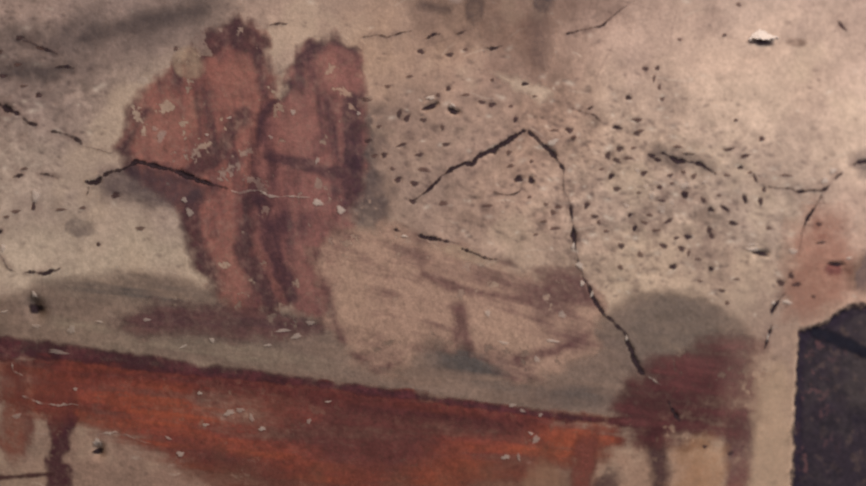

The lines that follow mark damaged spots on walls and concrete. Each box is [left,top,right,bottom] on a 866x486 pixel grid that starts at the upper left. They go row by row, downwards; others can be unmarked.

crack [0,104,82,144]
crack [85,159,226,188]
crack [314,200,344,213]
crack [415,129,565,200]
crack [769,159,866,225]
crack [395,228,487,259]
crack [28,268,57,276]
crack [570,206,645,375]
crack [765,300,791,348]